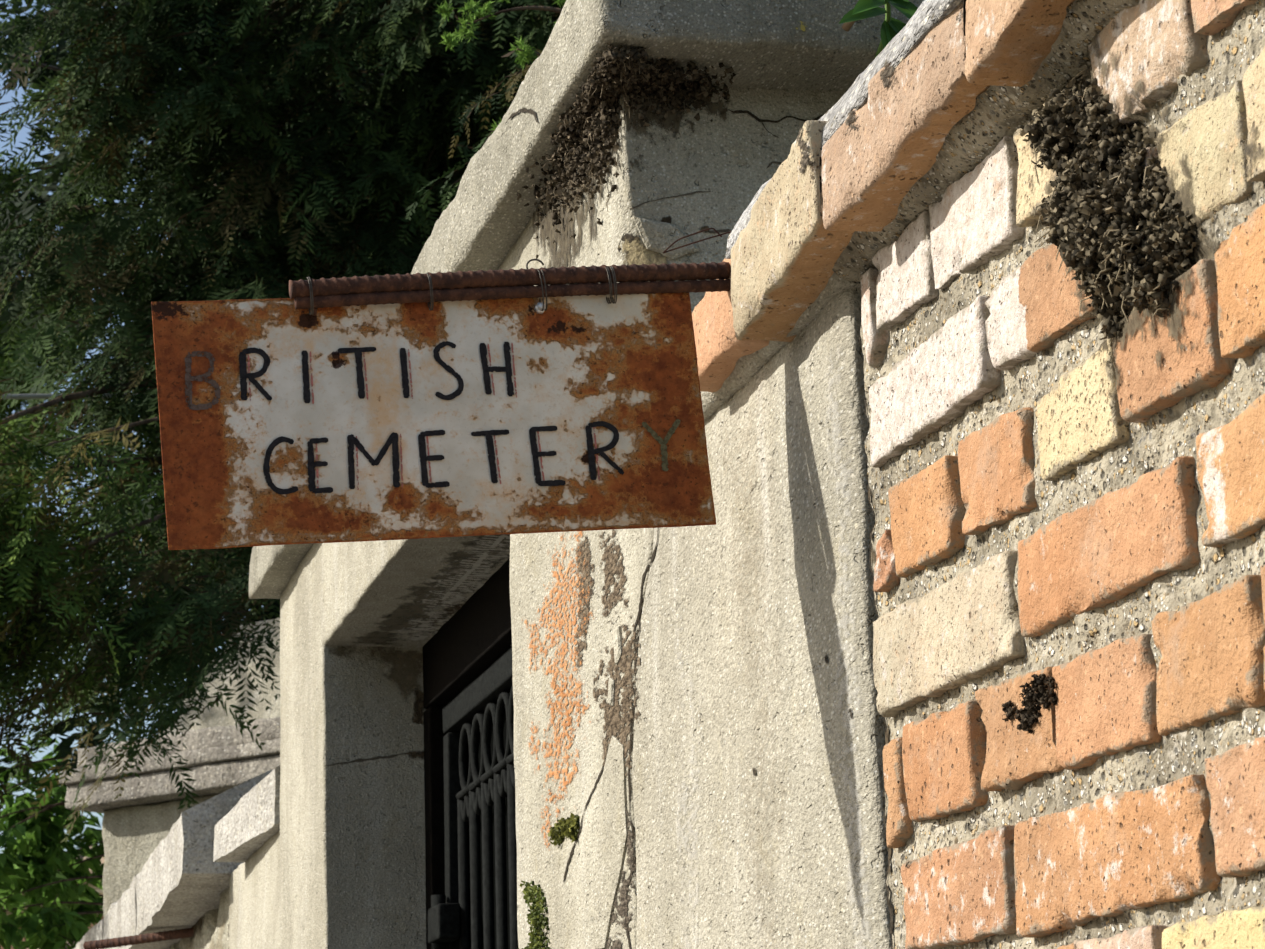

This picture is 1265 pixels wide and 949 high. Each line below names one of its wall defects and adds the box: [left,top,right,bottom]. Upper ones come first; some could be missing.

water stain [623,85,732,171]
water stain [539,173,597,268]
spalling [617,216,709,265]
rust [524,531,593,847]
crack [563,532,658,949]